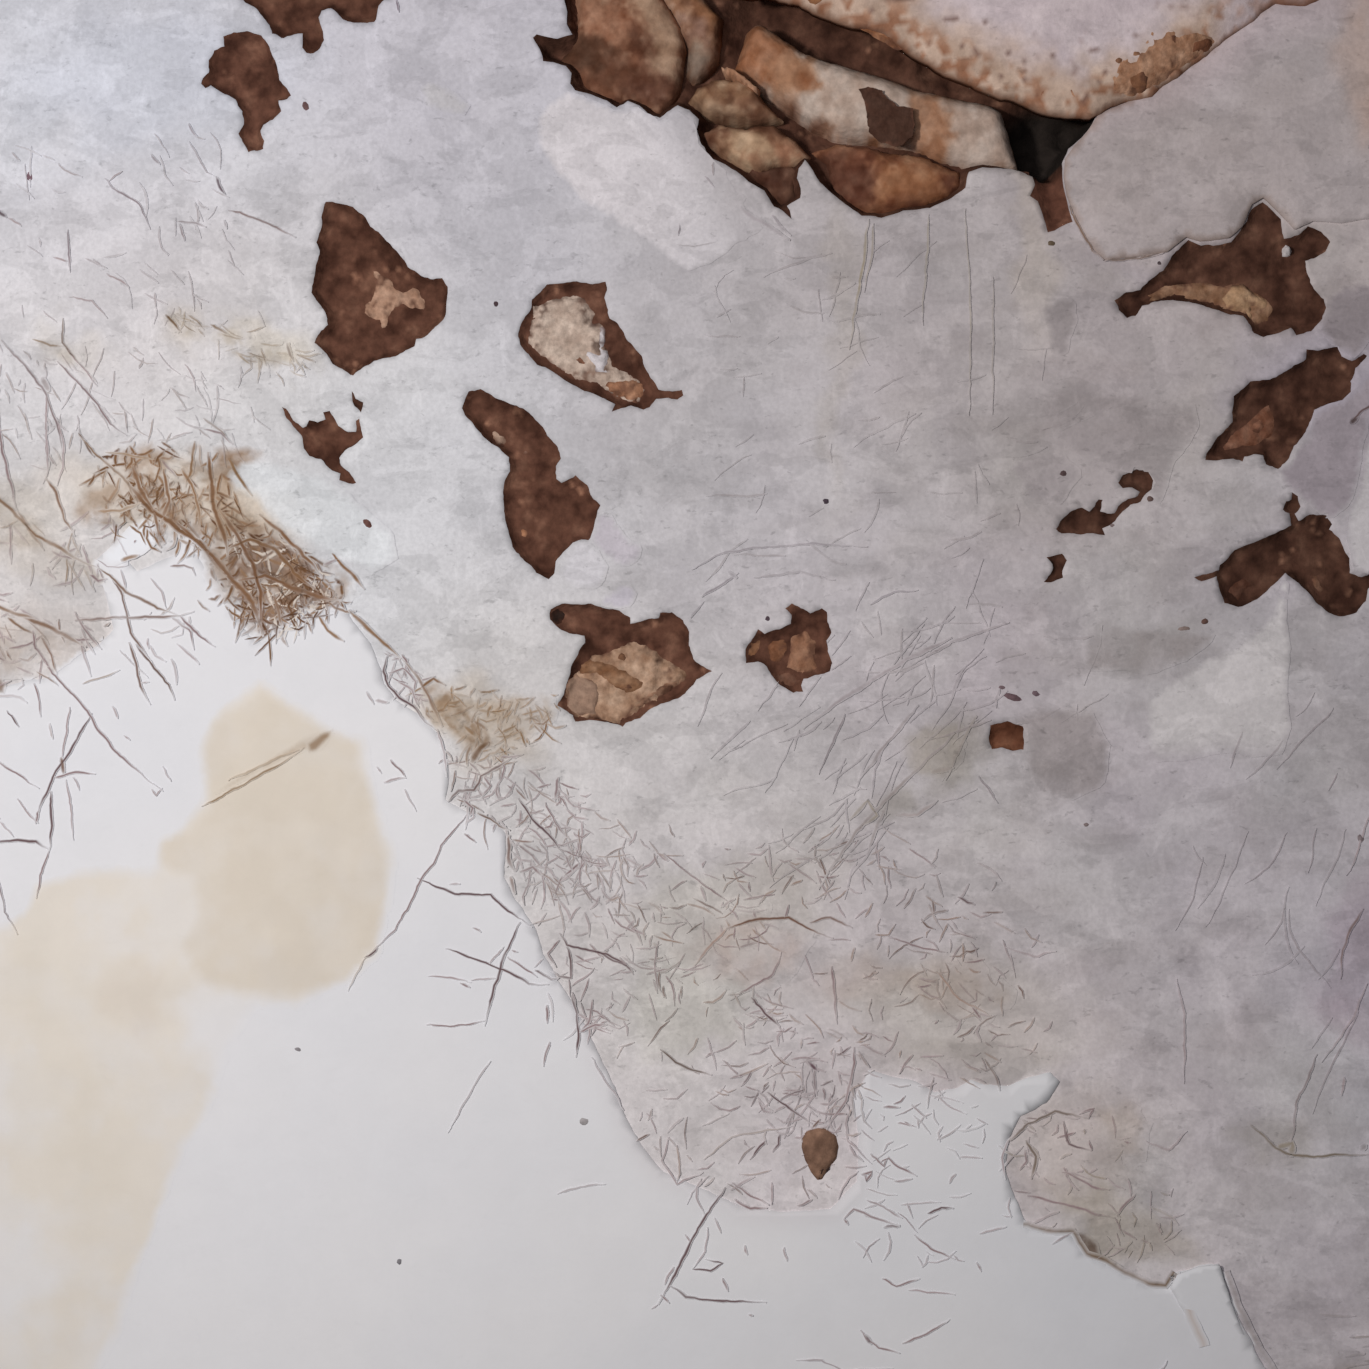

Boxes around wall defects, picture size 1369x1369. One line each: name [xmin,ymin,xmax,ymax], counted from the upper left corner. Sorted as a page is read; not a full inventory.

flaking render [201,0,383,152]
flaking render [533,0,1095,271]
peeling [226,392,398,573]
flaking render [311,202,448,375]
flaking render [462,389,711,727]
flaking render [518,281,683,411]
peeling [1041,294,1078,356]
peeling [1039,380,1200,535]
peeling [1083,202,1369,763]
crack [0,642,175,935]
leakage [0,677,399,1369]
peeling [0,518,1277,1369]